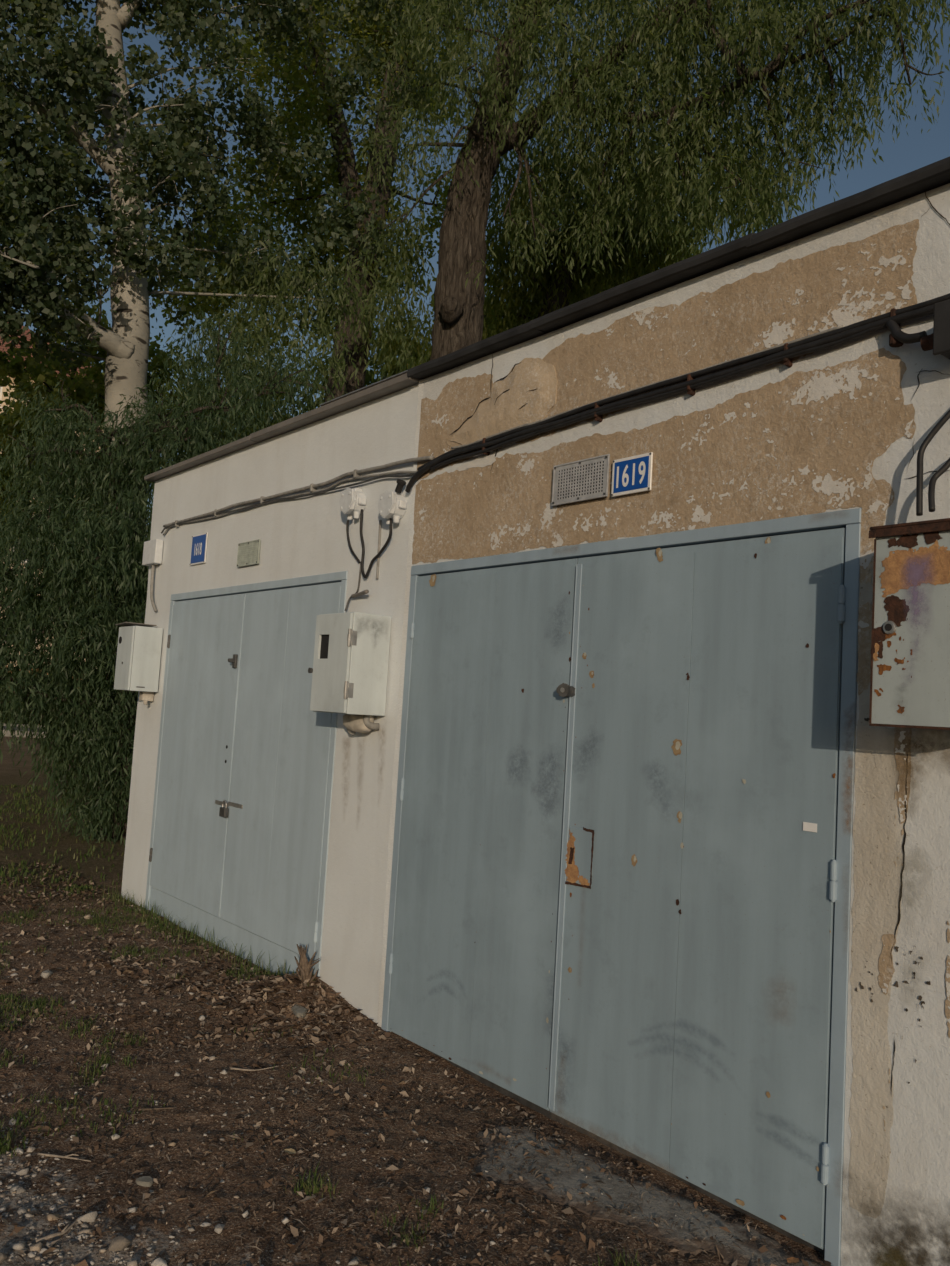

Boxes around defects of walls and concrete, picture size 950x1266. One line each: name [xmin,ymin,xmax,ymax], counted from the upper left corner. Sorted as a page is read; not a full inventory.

crack [450,355,536,435]
peeling [412,219,919,1219]
rust [564,827,594,889]
crack [891,753,908,960]
mould [864,1212,950,1266]